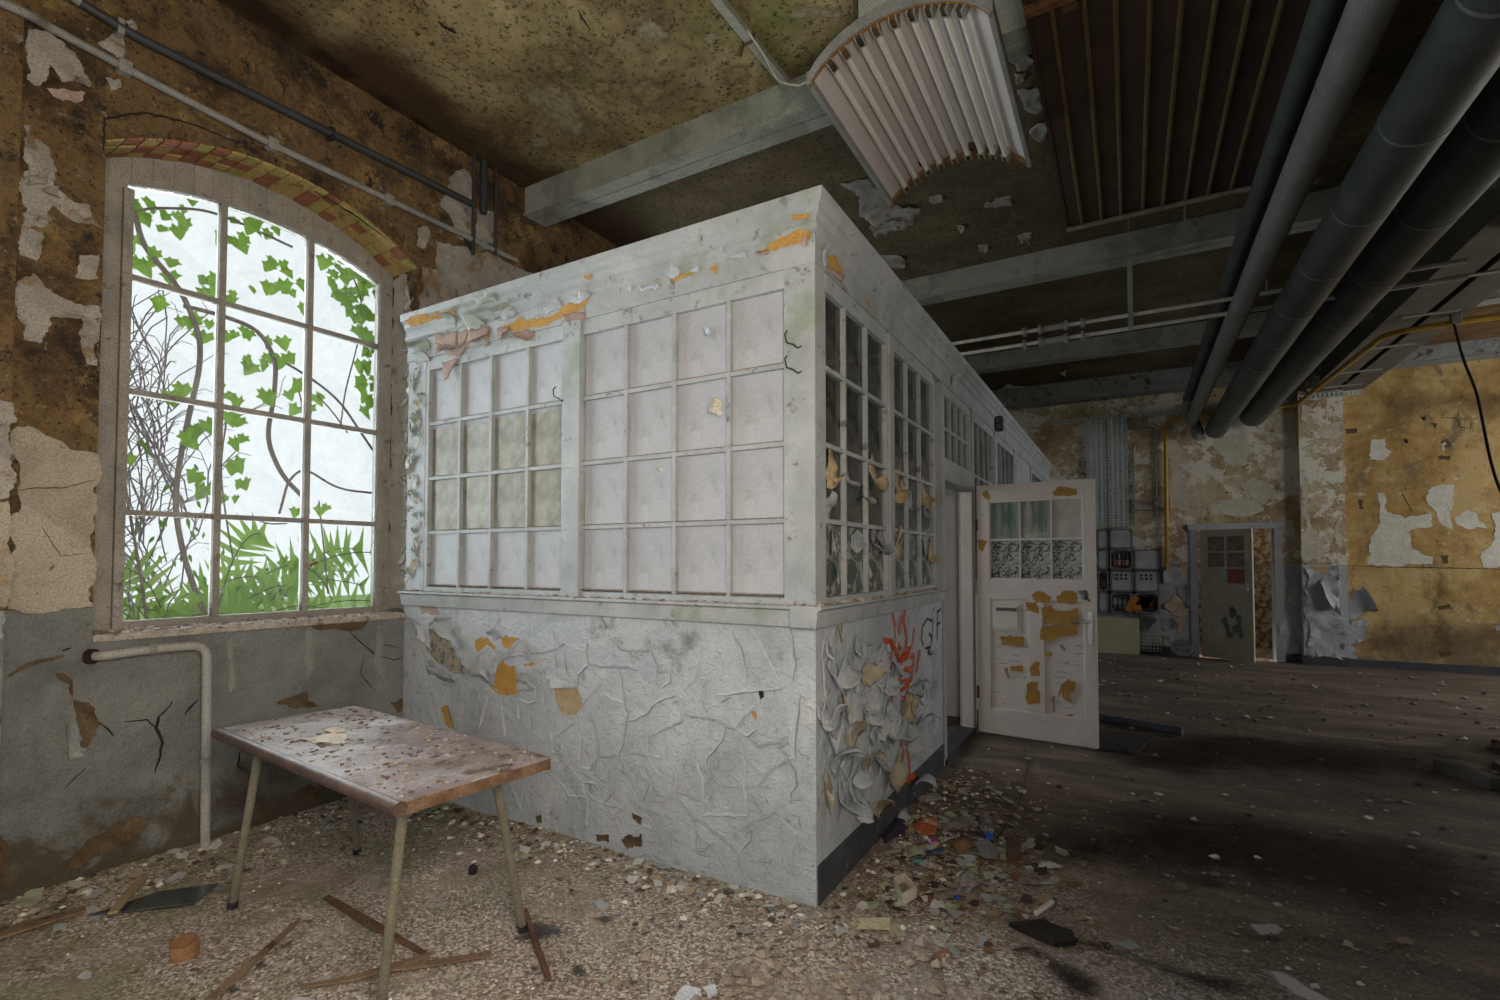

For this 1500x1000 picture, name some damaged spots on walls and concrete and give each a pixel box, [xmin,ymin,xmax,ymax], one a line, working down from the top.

peeling [25,29,122,103]
peeling [15,124,103,366]
peeling [613,213,846,292]
crack [8,647,71,677]
peeling [0,400,103,639]
crack [125,699,198,773]
peeling [387,169,592,715]
crack [478,616,943,878]
peeling [817,623,941,824]
peeling [1000,590,1091,705]
peeling [1279,475,1378,660]
peeling [1358,478,1500,568]